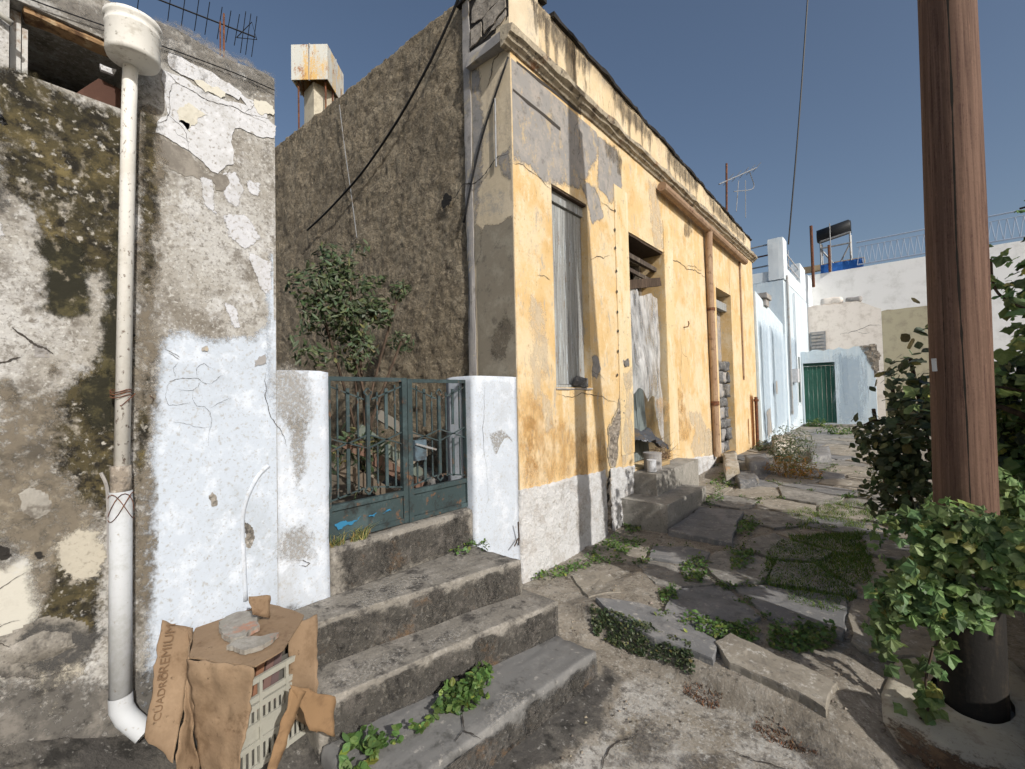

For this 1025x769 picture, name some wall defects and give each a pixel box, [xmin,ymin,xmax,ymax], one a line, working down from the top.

flaking render [498,58,622,224]
crack [165,349,223,439]
peeling [141,52,278,706]